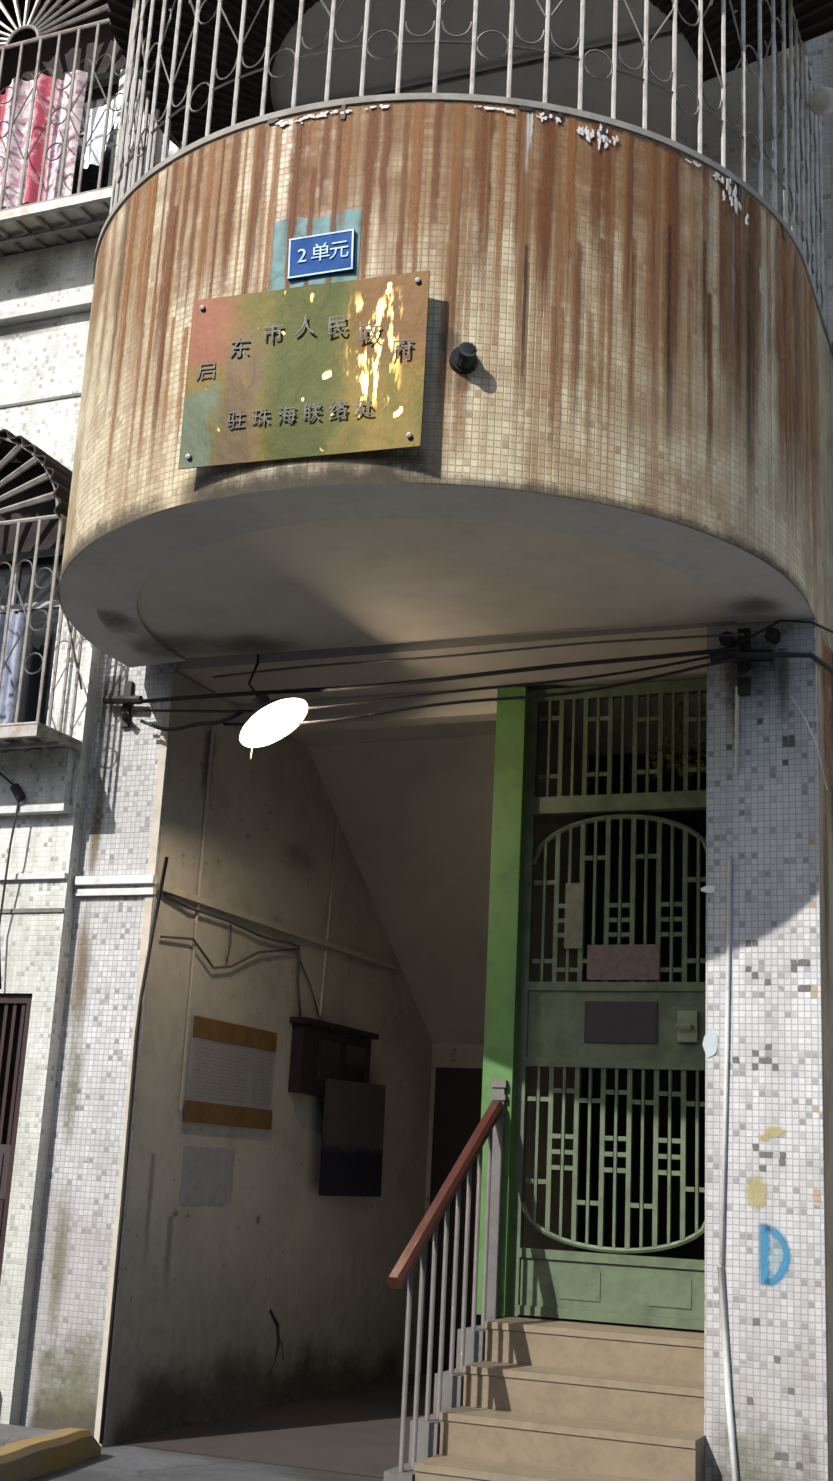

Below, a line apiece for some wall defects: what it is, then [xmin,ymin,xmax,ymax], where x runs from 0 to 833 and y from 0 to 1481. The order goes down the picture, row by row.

peeling [267,104,390,127]
peeling [474,105,619,150]
peeling [685,159,749,225]
corrosion [92,102,818,503]
leakage [116,1356,397,1442]